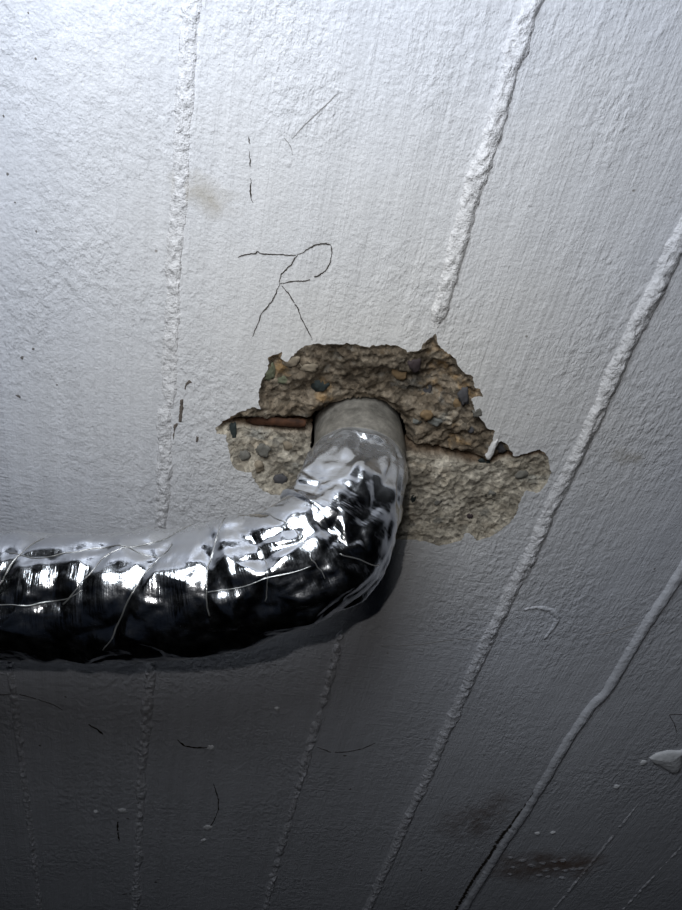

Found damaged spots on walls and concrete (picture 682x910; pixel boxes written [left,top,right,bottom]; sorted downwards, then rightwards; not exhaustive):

crack [239,243,332,338]
spalling [215,333,551,546]
crack [454,793,533,910]